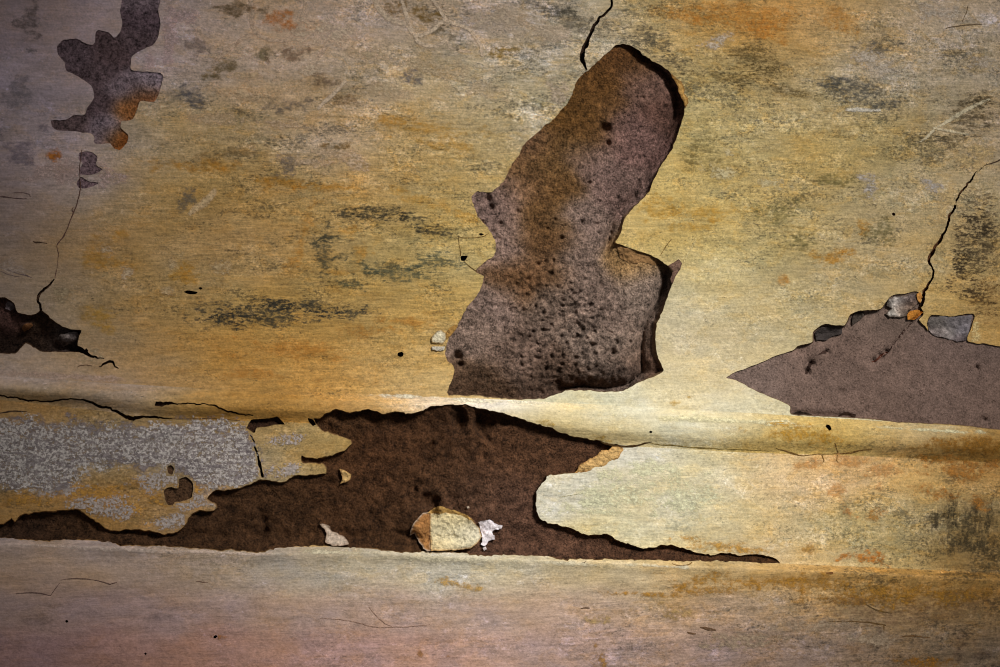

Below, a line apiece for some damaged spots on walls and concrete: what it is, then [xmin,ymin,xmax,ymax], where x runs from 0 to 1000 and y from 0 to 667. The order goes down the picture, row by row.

peeling [51,0,163,189]
crack [580,0,613,70]
crack [36,150,82,312]
crack [78,348,119,369]
flaking render [0,44,780,564]
flaking render [726,291,1000,431]
crack [921,159,1000,306]
crack [0,394,264,478]